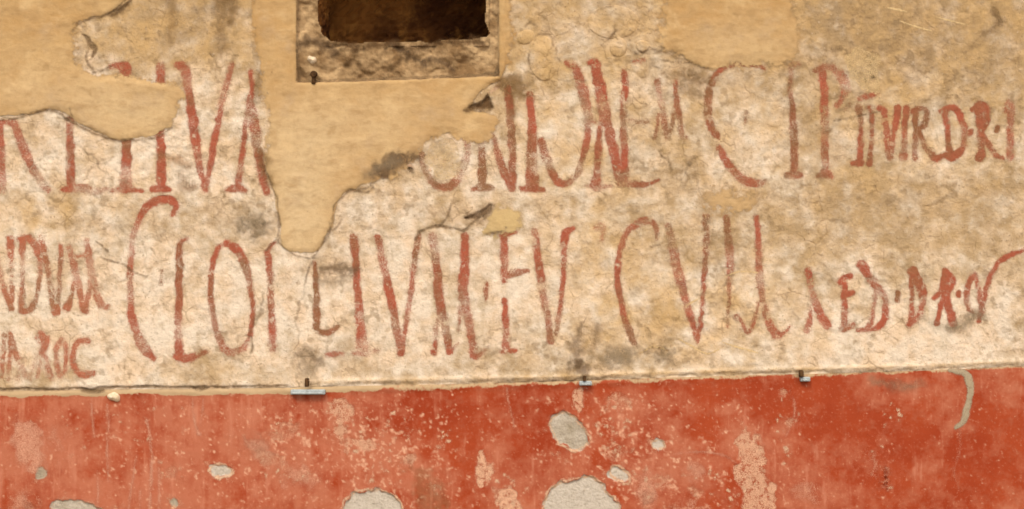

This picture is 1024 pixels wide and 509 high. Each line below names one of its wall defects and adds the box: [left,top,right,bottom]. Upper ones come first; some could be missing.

spalling [466,86,500,111]
spalling [465,204,492,220]
spalling [326,397,425,509]
spalling [538,386,719,509]
spalling [205,462,235,482]